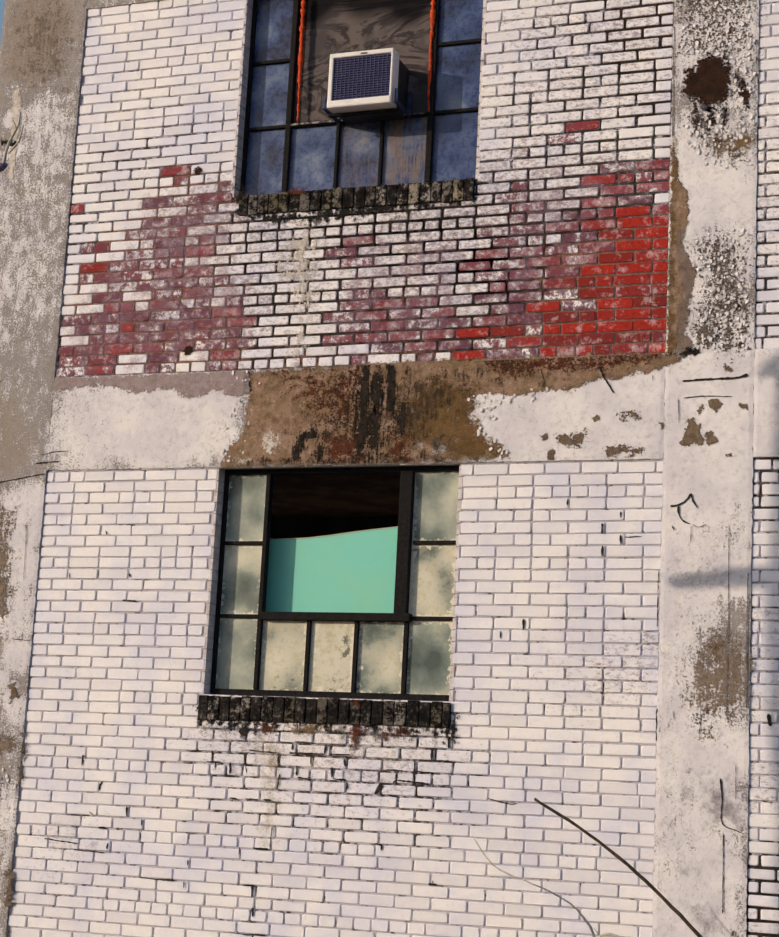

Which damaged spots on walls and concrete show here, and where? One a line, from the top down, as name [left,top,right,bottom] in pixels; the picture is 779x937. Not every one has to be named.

peeling [548,121,600,144]
crack [669,26,677,136]
spalling [593,0,770,130]
peeling [52,142,698,468]
leakage [235,360,529,466]
peeling [679,399,723,447]
crack [670,493,706,543]
crack [726,528,772,726]